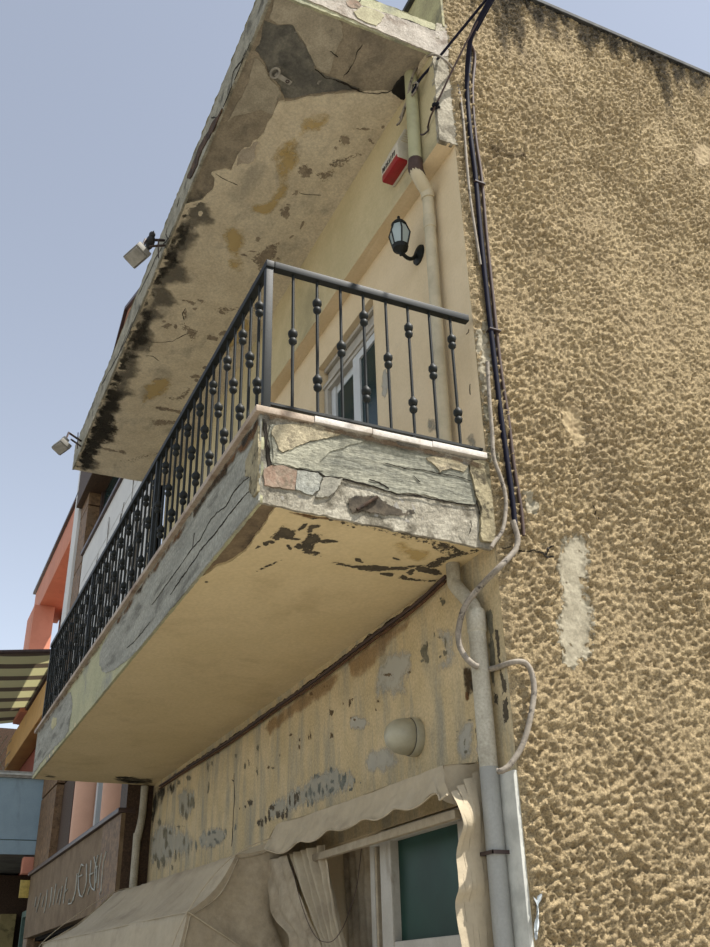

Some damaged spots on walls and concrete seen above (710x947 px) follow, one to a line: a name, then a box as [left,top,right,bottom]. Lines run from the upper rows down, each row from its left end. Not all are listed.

flaking render [187,0,449,202]
water stain [578,28,655,62]
peeling [241,221,304,271]
peeling [280,190,298,219]
water stain [77,192,213,471]
flaking render [99,404,500,673]
crack [127,419,480,648]
peeling [486,609,509,723]
peeling [151,775,236,870]
peeling [257,767,361,827]